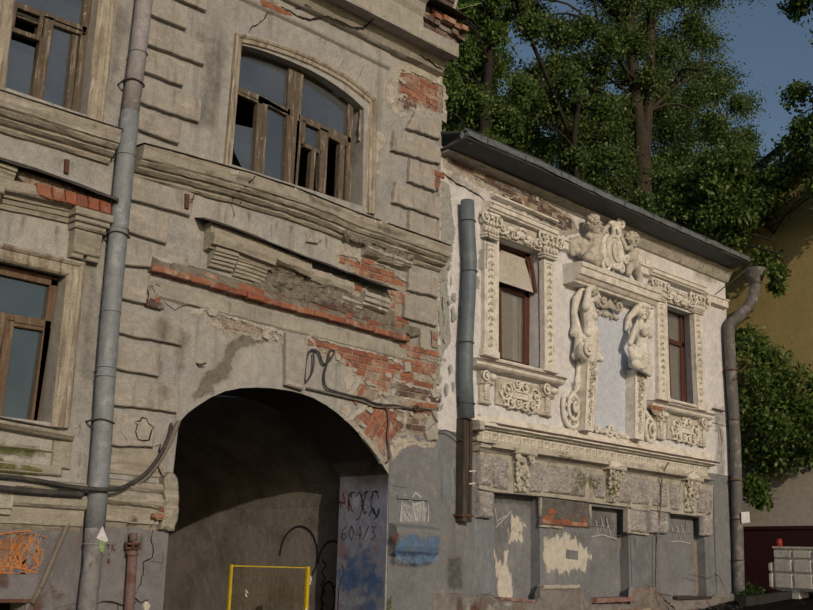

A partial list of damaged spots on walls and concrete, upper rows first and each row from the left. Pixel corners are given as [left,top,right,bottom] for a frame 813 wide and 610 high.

crack [248,4,374,33]
spalling [385,60,448,123]
flaking render [148,156,579,461]
crack [122,417,164,478]
spalling [538,497,592,529]
crack [98,519,157,606]